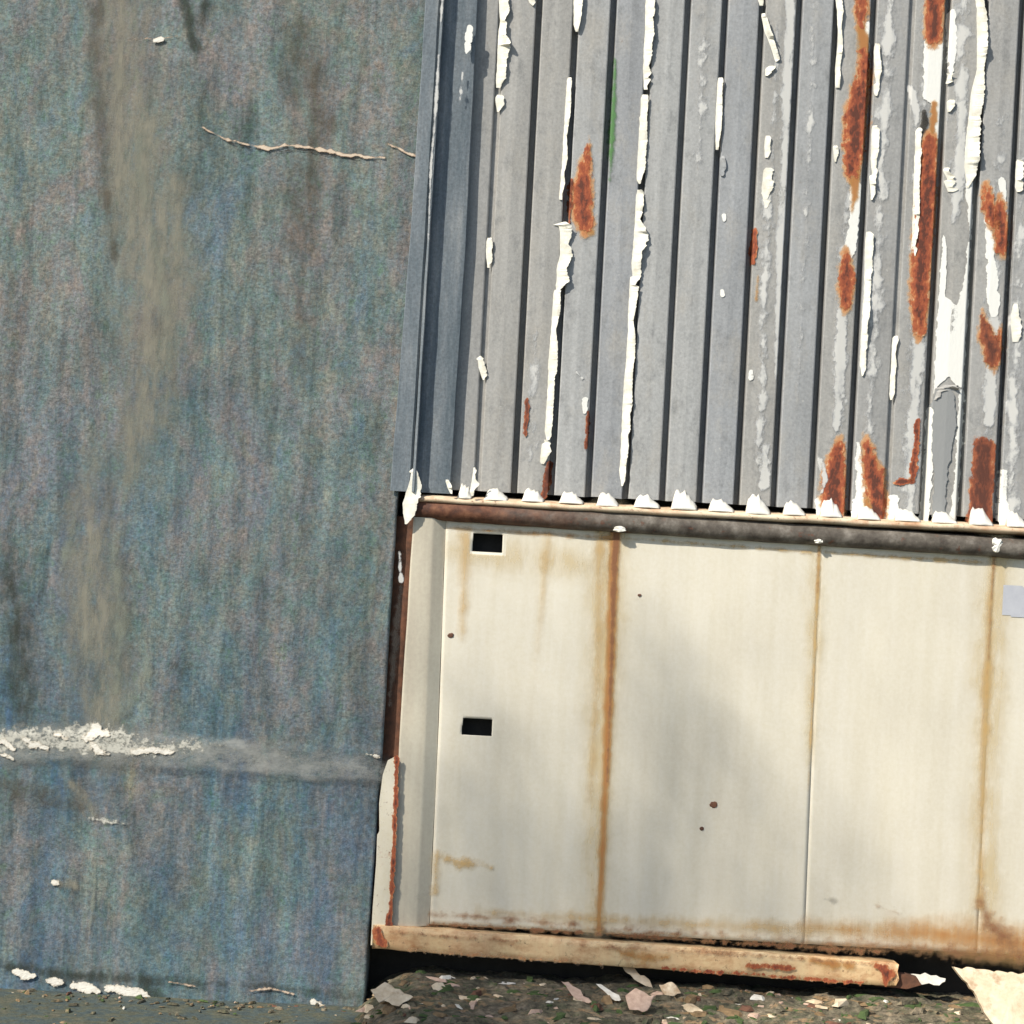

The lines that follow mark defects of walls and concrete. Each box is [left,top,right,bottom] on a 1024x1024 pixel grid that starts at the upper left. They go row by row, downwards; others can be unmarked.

crack [202,127,416,159]
peeling [495,0,511,112]
peeling [528,222,573,464]
peeling [559,77,572,200]
rust [566,143,596,238]
peeling [619,0,655,486]
rust [841,0,873,211]
rust [907,101,938,344]
peeling [832,0,1024,525]
rust [818,434,847,516]
rust [966,436,997,523]
rust [590,532,896,987]